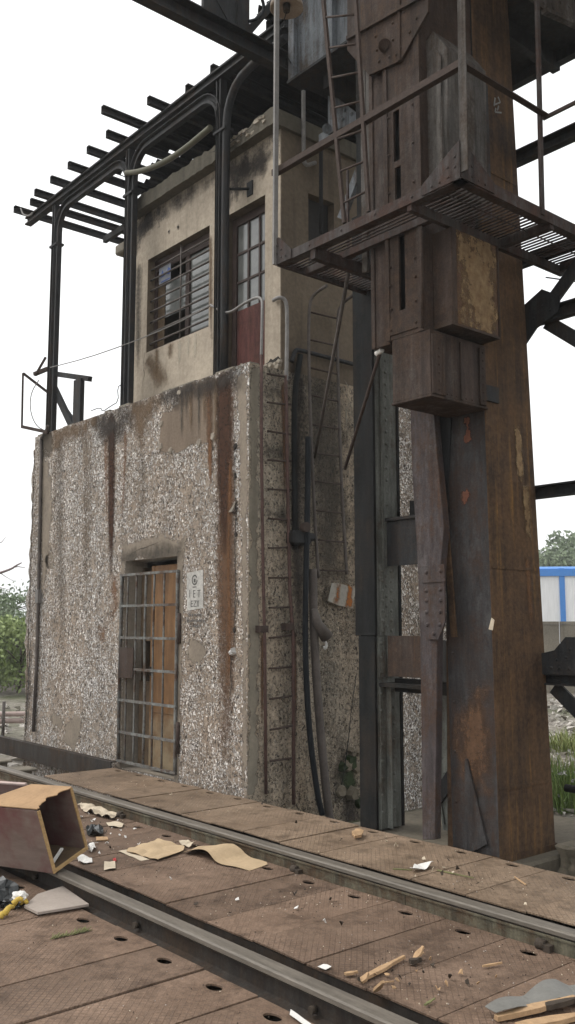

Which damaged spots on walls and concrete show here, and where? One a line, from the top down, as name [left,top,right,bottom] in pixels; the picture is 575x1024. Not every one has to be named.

leakage [132,267,196,438]
rust [105,413,126,562]
rust [206,373,235,731]
rust [453,689,490,791]